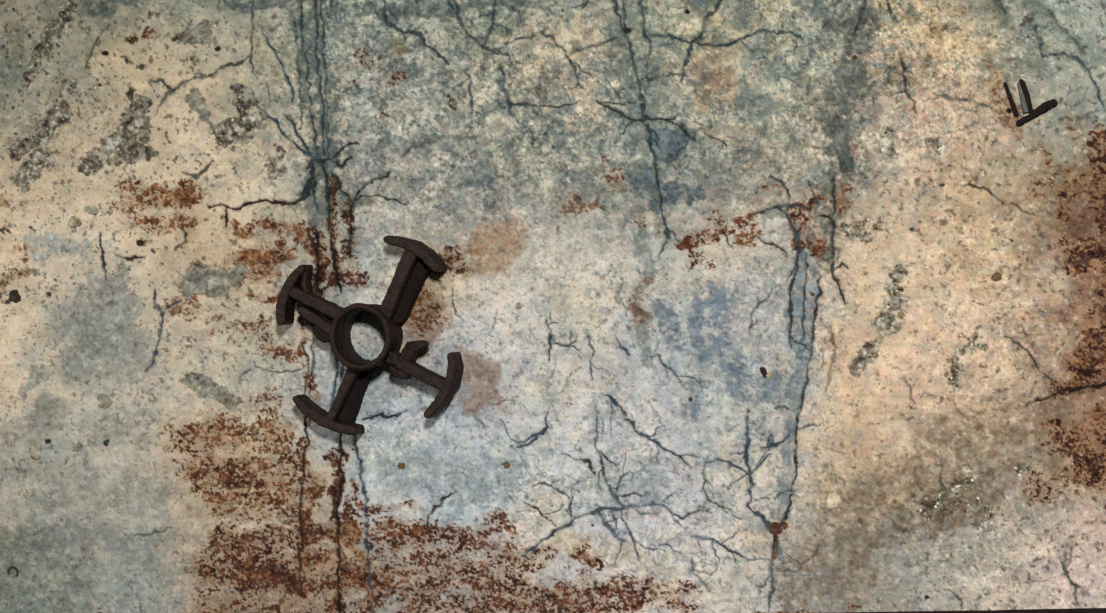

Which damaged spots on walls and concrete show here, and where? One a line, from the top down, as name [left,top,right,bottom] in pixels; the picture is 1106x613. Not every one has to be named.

spalling [22,0,77,90]
spalling [7,78,106,193]
spalling [78,84,158,176]
corrosion [107,177,206,246]
spalling [184,84,266,149]
crack [149,0,422,297]
corrosion [206,173,372,400]
crack [335,410,408,613]
corrosion [161,388,702,613]
crack [447,0,804,255]
crack [524,176,848,613]
corrosion [1027,123,1106,400]